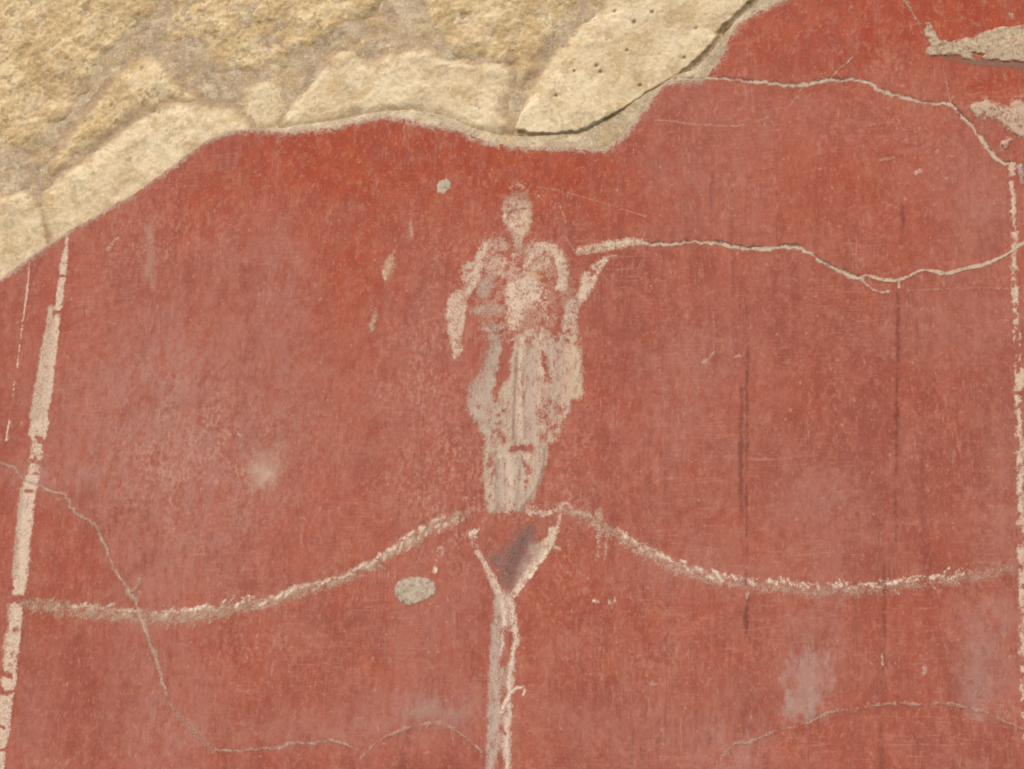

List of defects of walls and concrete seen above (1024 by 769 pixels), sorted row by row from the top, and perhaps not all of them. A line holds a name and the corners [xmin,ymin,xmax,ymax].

flaking render [903,0,1024,69]
crack [674,57,1013,166]
flaking render [969,94,1024,149]
peeling [437,178,451,194]
peeling [380,250,396,282]
crack [638,238,1024,294]
crack [0,461,359,753]